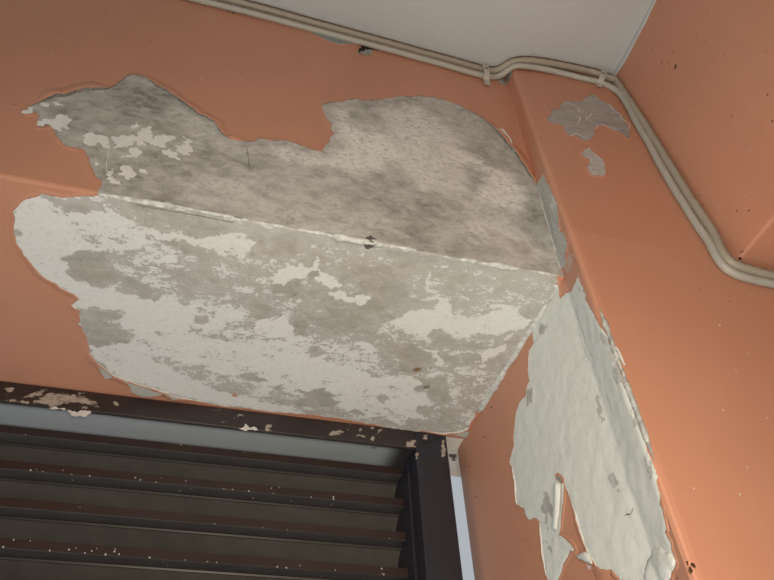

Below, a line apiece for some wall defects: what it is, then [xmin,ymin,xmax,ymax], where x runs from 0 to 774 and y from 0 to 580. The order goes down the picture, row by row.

peeling [8,73,679,580]